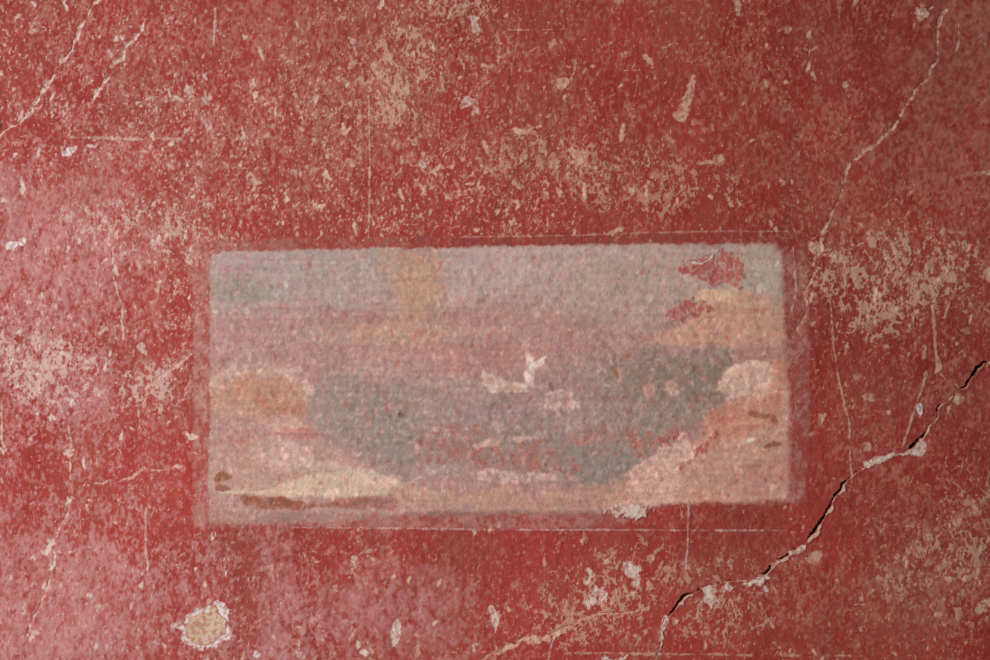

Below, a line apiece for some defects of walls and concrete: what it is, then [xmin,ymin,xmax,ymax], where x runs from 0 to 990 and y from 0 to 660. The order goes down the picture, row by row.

crack [0,0,102,139]
crack [90,20,146,108]
crack [481,357,990,660]
spalling [170,599,236,660]